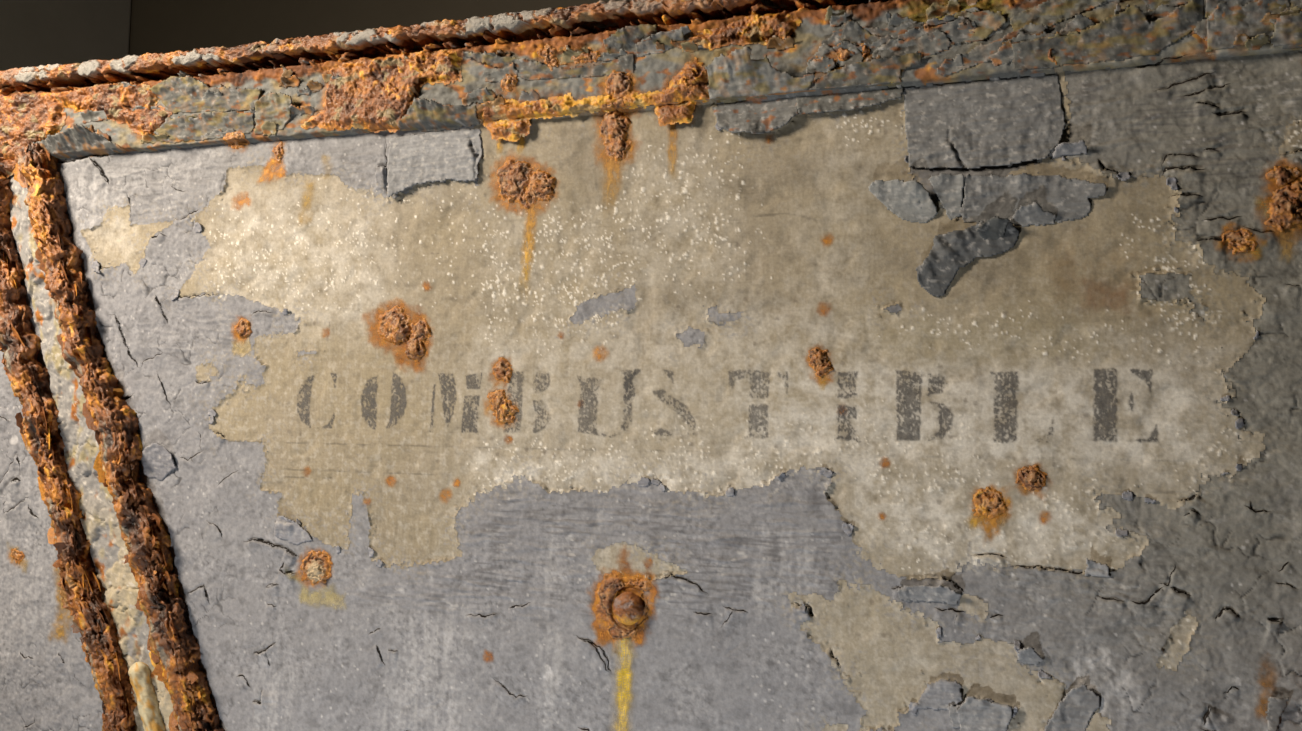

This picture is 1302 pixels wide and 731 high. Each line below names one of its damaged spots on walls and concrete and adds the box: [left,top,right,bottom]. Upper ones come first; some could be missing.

rust [0,81,172,178]
rust [300,49,463,133]
rust [479,8,802,173]
crack [1134,54,1243,116]
crack [1161,148,1275,241]
peeling [170,0,1302,581]
crack [210,523,297,607]
crack [654,573,748,624]
crack [975,553,1191,604]
crack [576,635,611,672]
peeling [788,580,1111,731]
peeling [1156,611,1198,671]